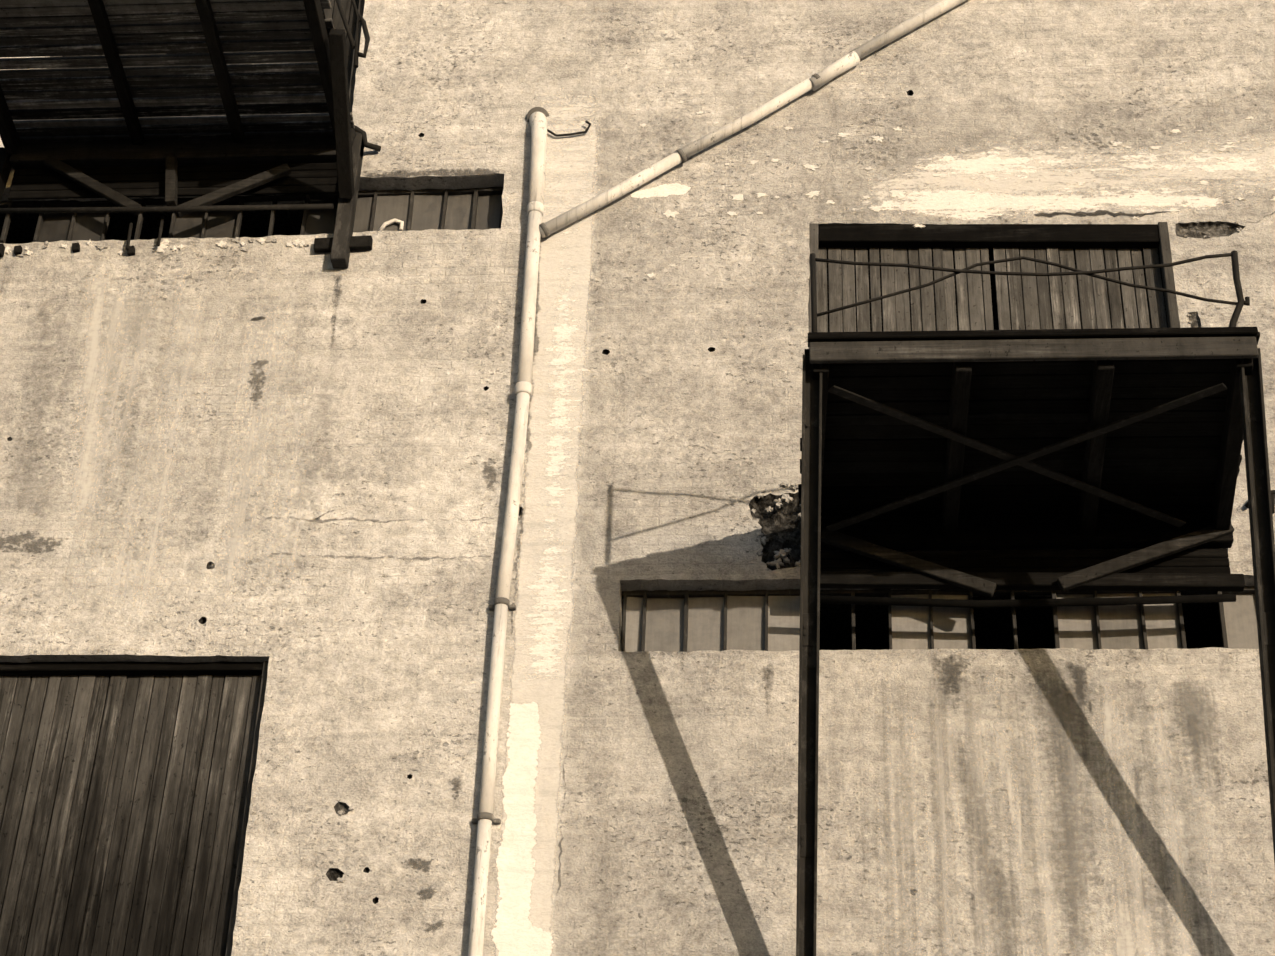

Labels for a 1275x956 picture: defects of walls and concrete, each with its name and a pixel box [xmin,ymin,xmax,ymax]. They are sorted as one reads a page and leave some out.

peeling [630,183,691,218]
peeling [727,193,780,217]
peeling [853,125,1275,239]
peeling [511,90,600,933]
spalling [749,481,801,571]
damp [935,656,962,693]
damp [996,735,1022,852]
damp [1038,664,1086,902]
damp [1117,804,1145,956]